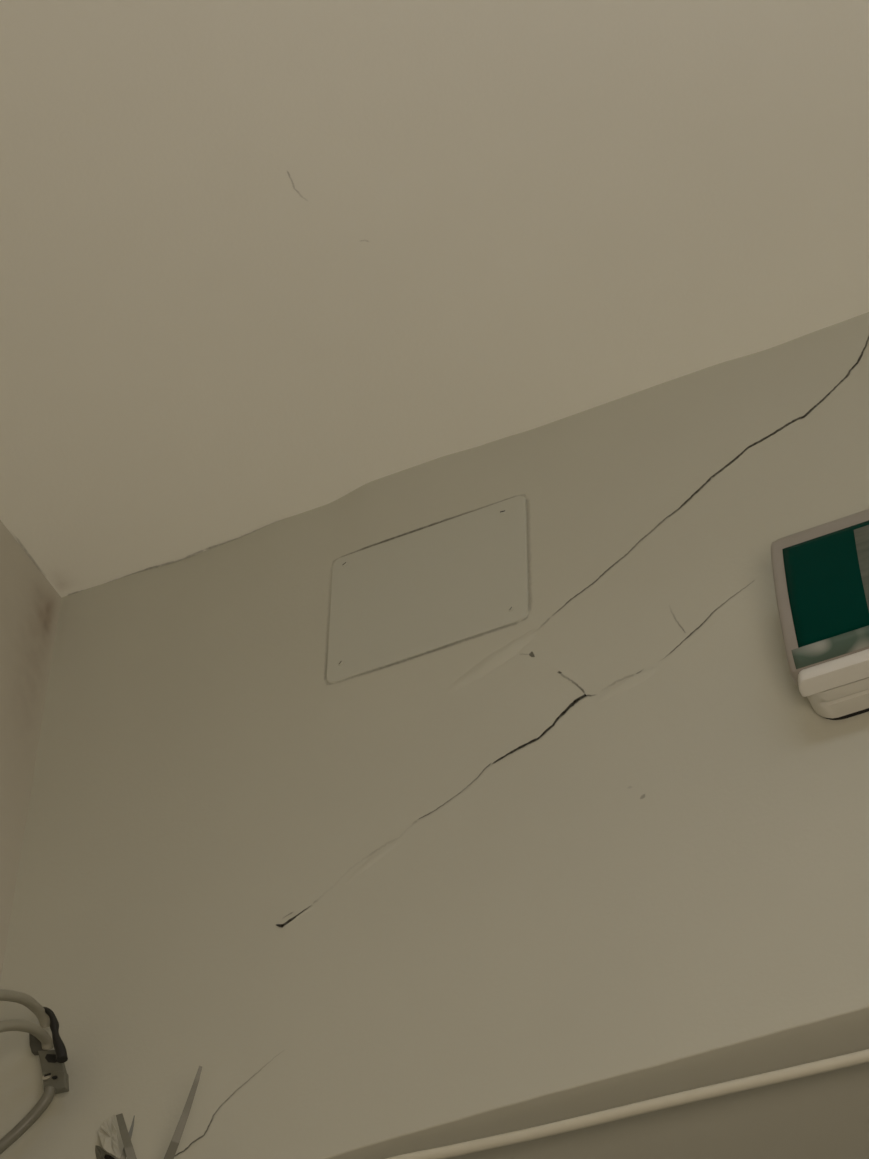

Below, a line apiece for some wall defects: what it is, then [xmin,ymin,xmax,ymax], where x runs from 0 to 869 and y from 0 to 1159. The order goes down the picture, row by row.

crack [663,336,869,521]
crack [489,694,588,765]
crack [276,906,314,928]